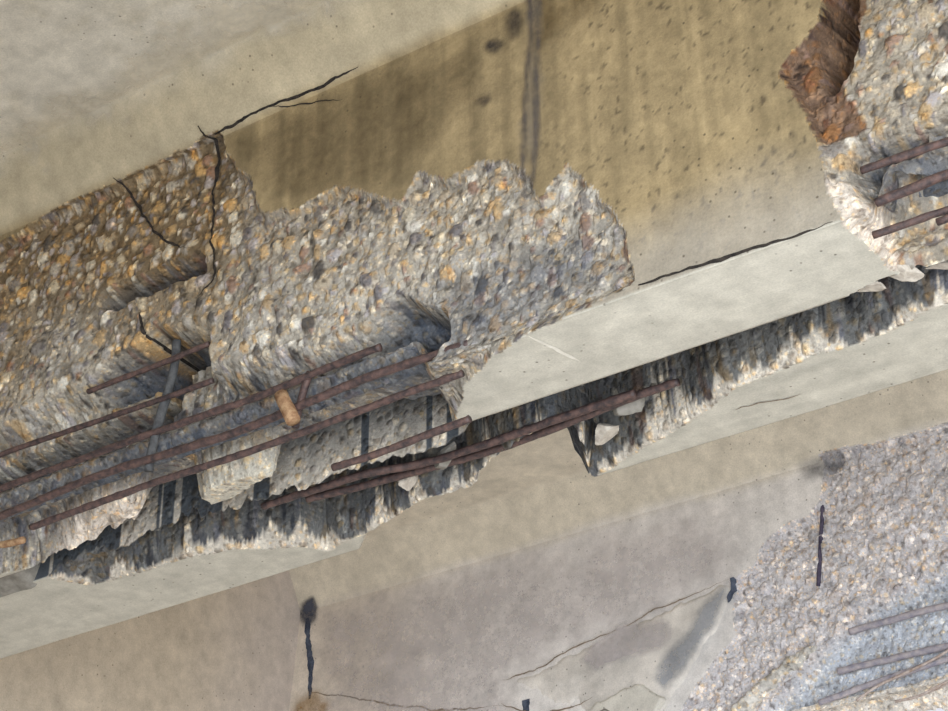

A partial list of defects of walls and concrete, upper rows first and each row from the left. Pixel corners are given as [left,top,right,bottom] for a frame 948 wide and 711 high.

crack [114,178,185,248]
crack [198,67,358,294]
water stain [486,41,502,51]
water stain [523,40,539,154]
spalling [778,0,948,272]
crack [139,313,201,372]
spalling [0,129,948,586]
spalling [507,422,948,711]
crack [313,692,526,711]